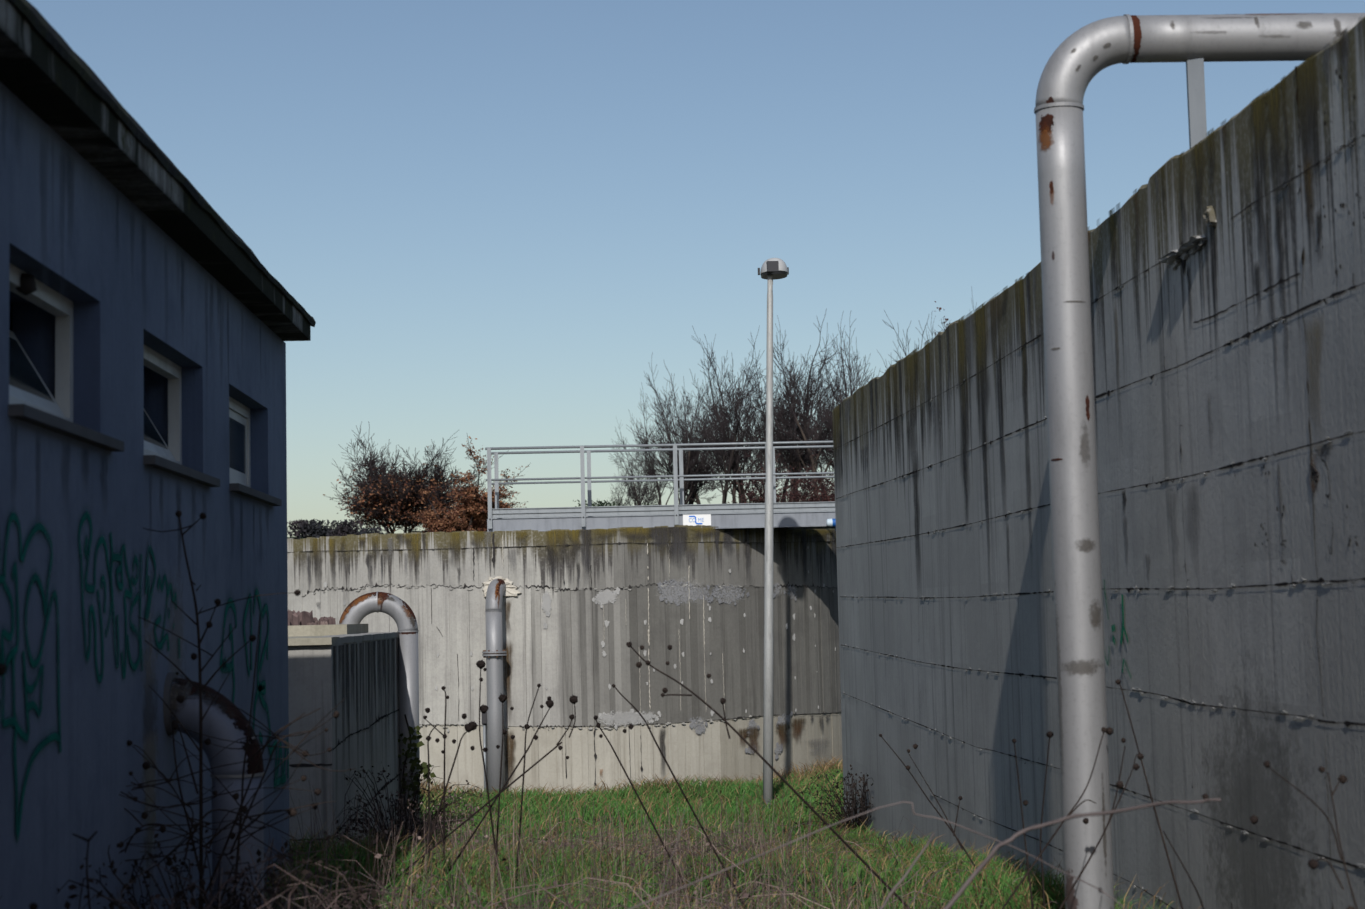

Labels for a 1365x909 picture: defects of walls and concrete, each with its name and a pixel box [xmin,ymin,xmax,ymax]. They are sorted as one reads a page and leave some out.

rust [1131,15,1142,63]
rust [1039,97,1054,134]
water stain [1179,120,1226,238]
water stain [1251,17,1361,358]
water stain [1187,227,1216,315]
water stain [833,267,1036,536]
water stain [307,533,425,577]
water stain [547,527,750,581]
water stain [781,528,836,572]
rust [339,592,416,634]
peeling [657,569,749,625]
rust [173,678,264,774]